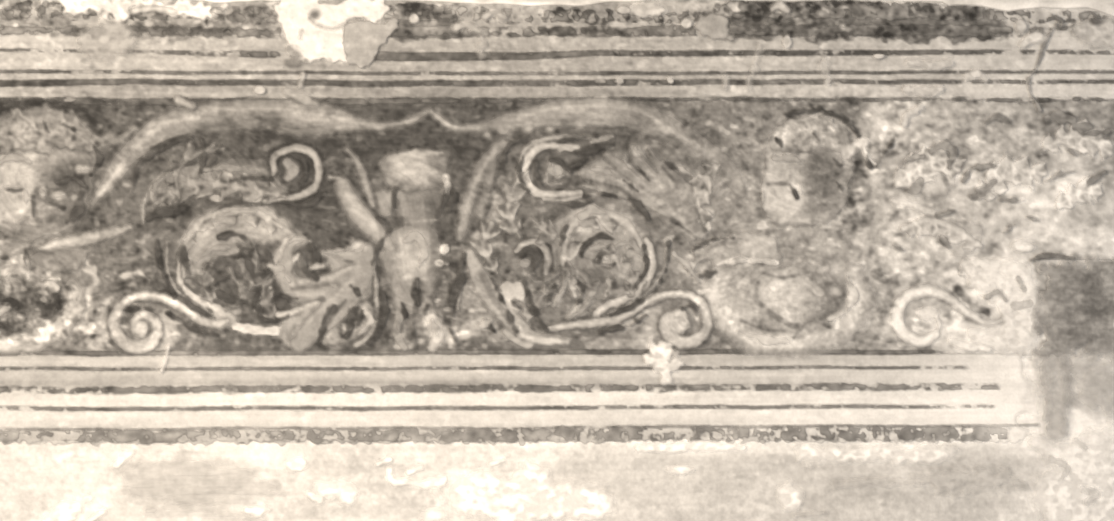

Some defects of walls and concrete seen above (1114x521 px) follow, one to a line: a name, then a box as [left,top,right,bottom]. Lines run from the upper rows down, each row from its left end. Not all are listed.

peeling [301,0,344,31]
peeling [285,46,308,66]
crack [1026,14,1064,112]